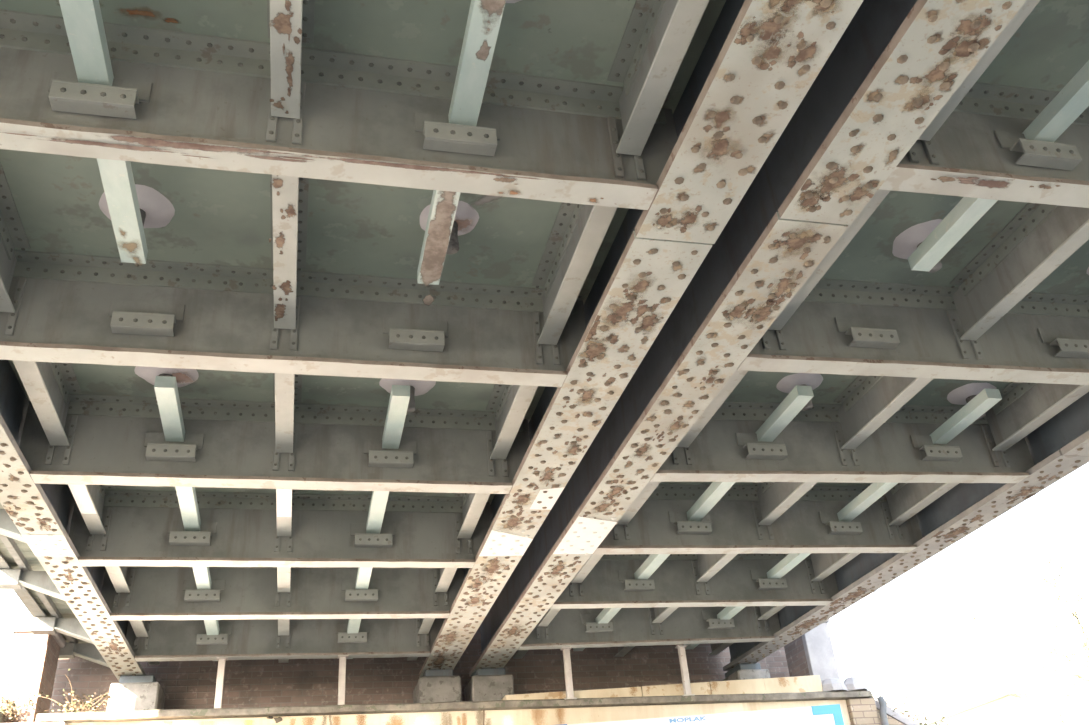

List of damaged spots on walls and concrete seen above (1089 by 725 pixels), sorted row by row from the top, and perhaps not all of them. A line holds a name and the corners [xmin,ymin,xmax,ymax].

rust [476,0,506,60]
rust [931,177,1009,188]
rust [420,191,456,306]
rust [0,443,52,531]
rust [590,393,707,515]
rust [45,557,136,675]
water stain [385,710,516,725]